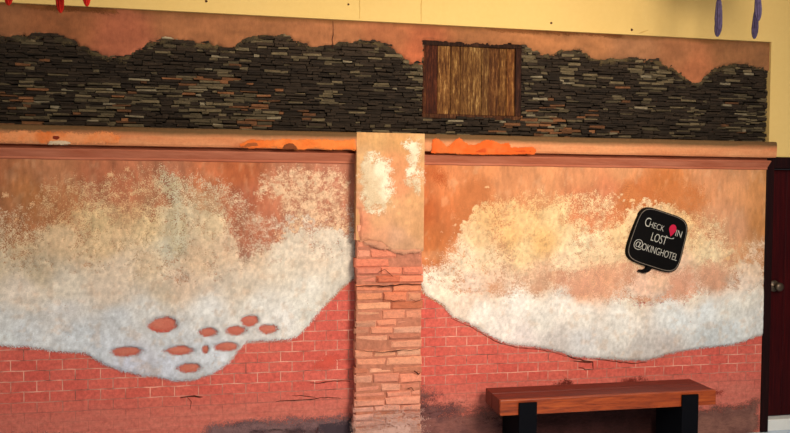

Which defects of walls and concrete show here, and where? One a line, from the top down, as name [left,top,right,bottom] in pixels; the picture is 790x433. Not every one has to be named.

flaking render [0,32,768,196]
leakage [446,174,494,239]
peeling [0,151,765,433]
crack [276,380,350,402]
leakage [201,381,503,433]
leakage [537,408,656,433]